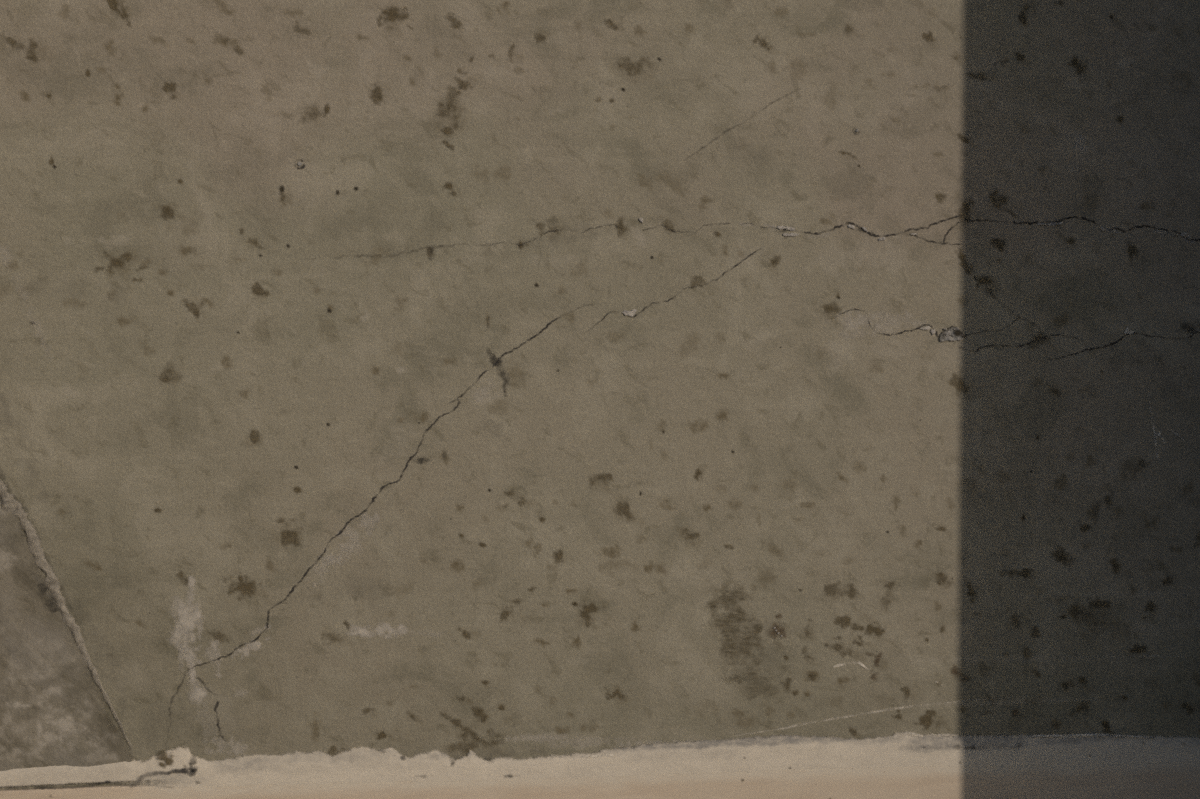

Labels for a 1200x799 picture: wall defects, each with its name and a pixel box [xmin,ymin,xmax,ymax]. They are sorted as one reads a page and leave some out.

crack [777,216,1200,245]
crack [602,298,673,320]
crack [855,309,1194,357]
crack [199,318,558,666]